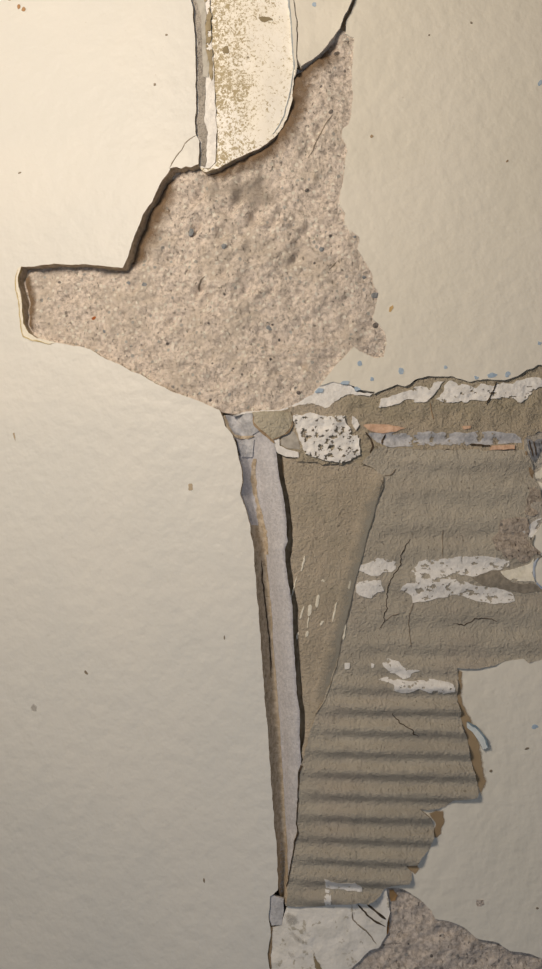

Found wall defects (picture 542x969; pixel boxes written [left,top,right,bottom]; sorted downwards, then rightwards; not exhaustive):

crack [340,0,355,31]
spalling [15,0,387,415]
peeling [466,721,489,749]
spalling [352,888,542,969]